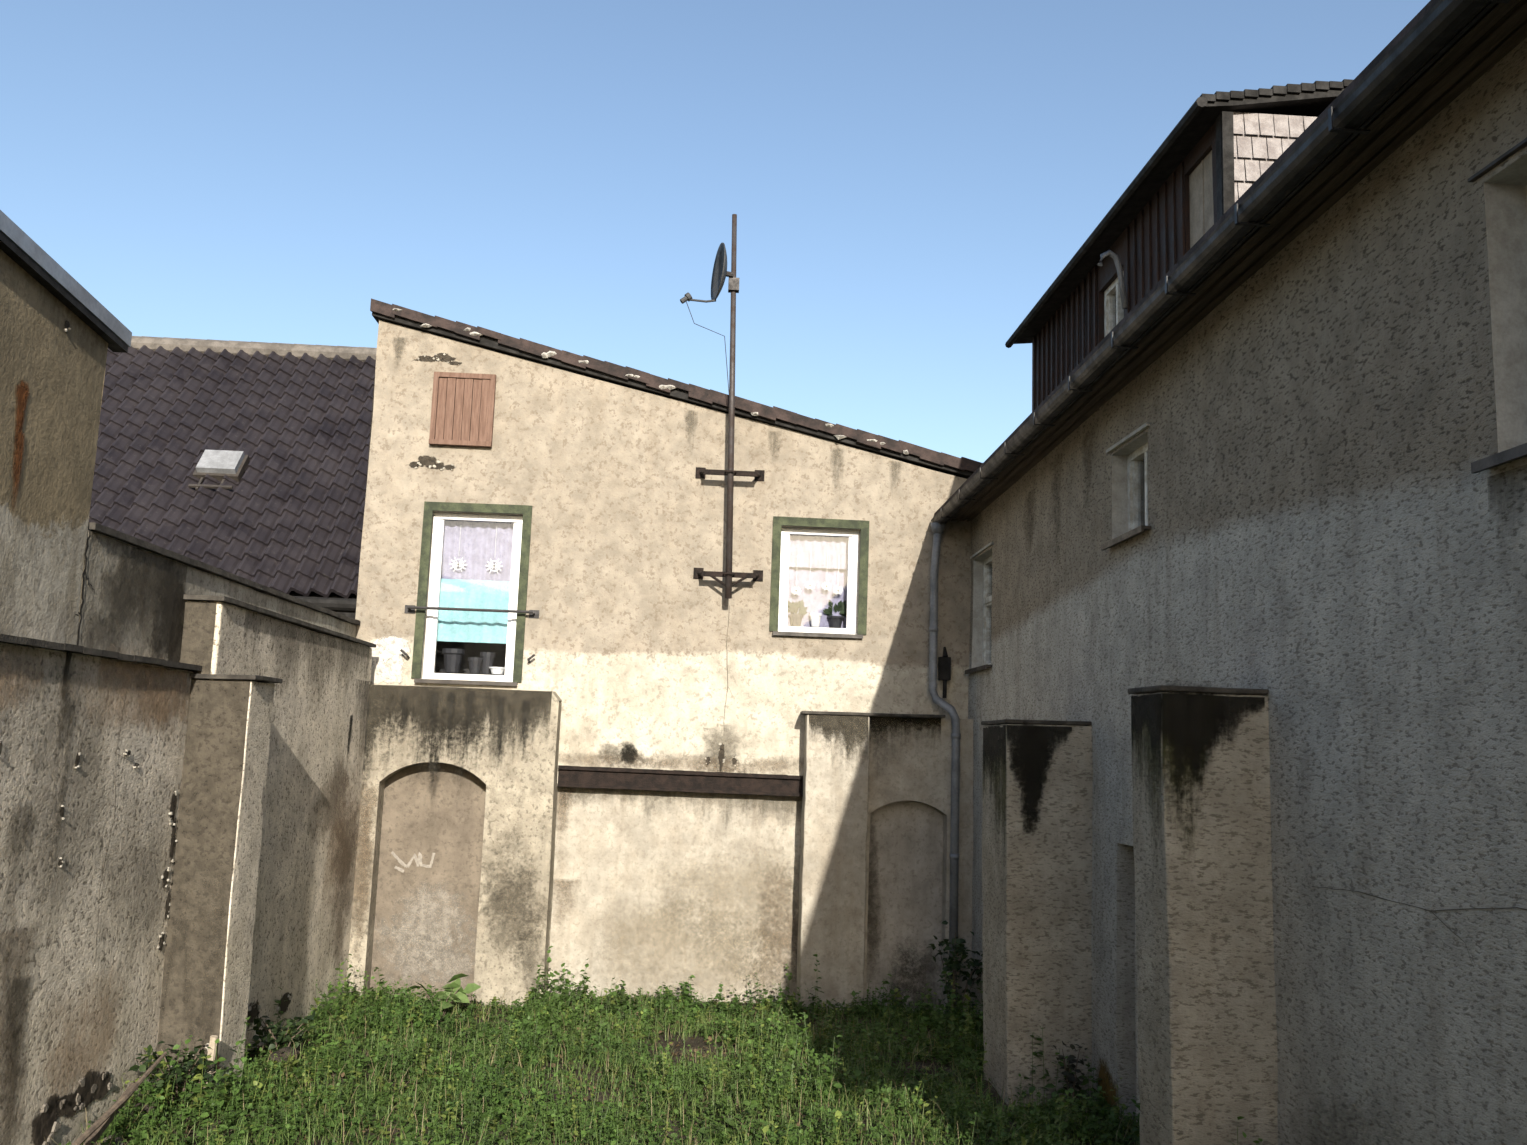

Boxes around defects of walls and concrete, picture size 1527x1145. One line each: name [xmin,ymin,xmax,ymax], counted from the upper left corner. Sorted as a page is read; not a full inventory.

corrosion [12,380,29,508]
damp [347,685,552,789]
damp [982,722,1072,847]
damp [1131,684,1265,833]
crack [1312,886,1527,967]
flaking render [31,1070,112,1145]